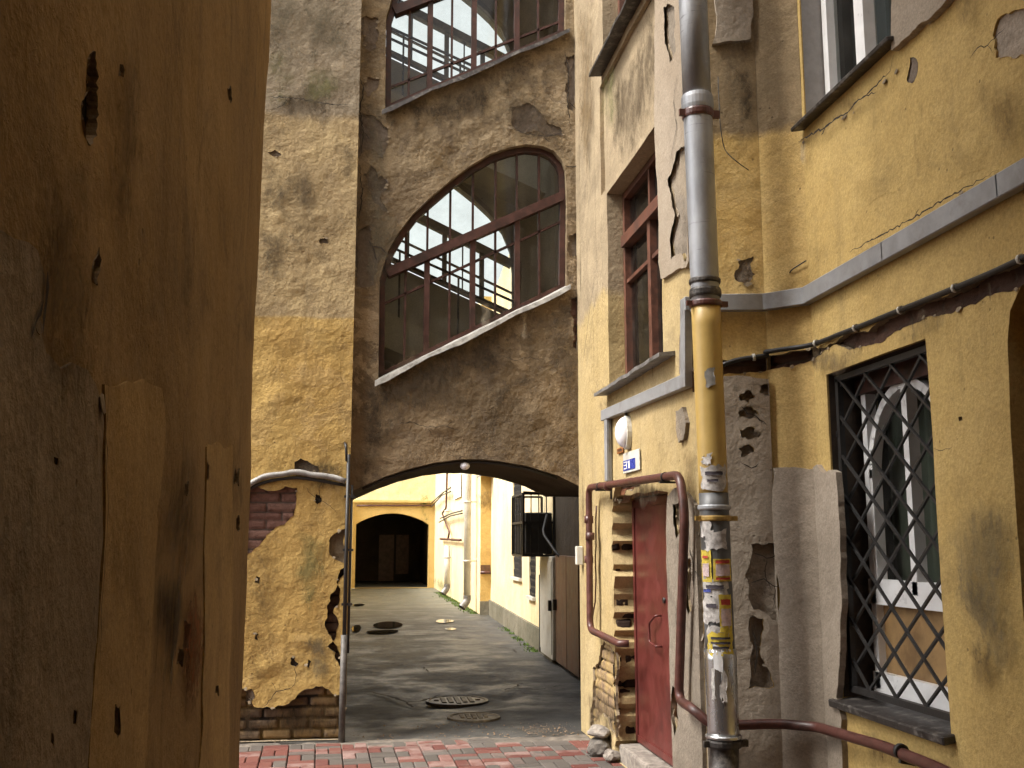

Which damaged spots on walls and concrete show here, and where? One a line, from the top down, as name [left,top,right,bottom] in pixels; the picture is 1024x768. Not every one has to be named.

flaking render [993,8,1024,60]
spalling [81,51,99,146]
flaking render [358,113,390,213]
flaking render [510,103,563,137]
flaking render [671,147,688,256]
crack [801,58,898,144]
crack [851,170,997,251]
spalling [734,256,755,287]
flaking render [723,263,1024,768]
peeling [177,442,347,768]
flaking render [612,588,634,628]
flaking render [590,641,640,744]